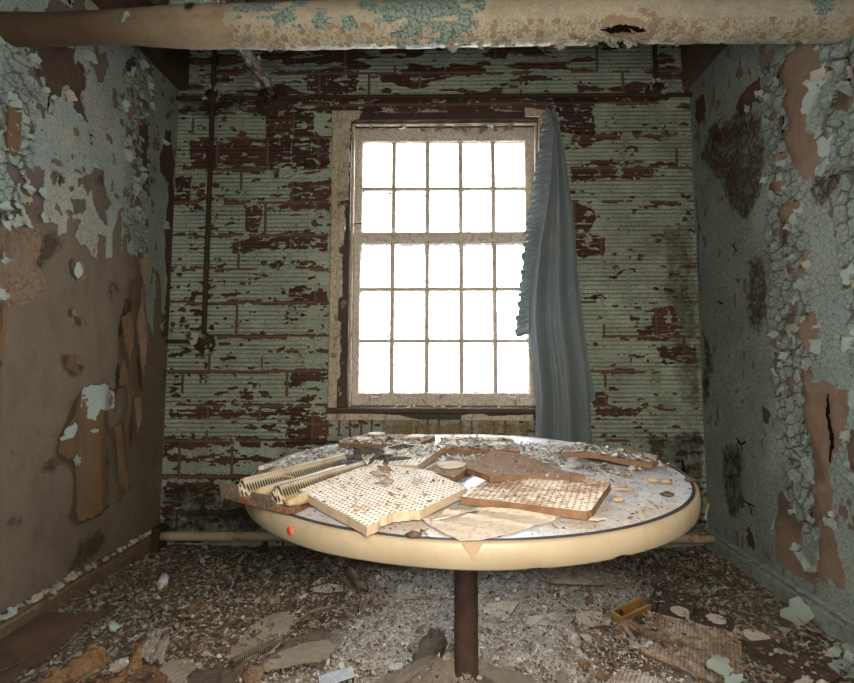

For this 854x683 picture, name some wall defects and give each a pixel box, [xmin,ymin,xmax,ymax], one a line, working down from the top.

peeling [228,0,486,48]
peeling [33,46,109,123]
peeling [57,162,111,226]
flaking render [122,68,682,337]
leakage [700,109,764,220]
peeling [769,44,828,192]
flaking render [636,306,698,364]
peeling [166,384,669,495]
peeling [771,379,854,590]
crack [825,394,834,463]
peeling [0,530,152,621]
peeling [11,544,428,683]